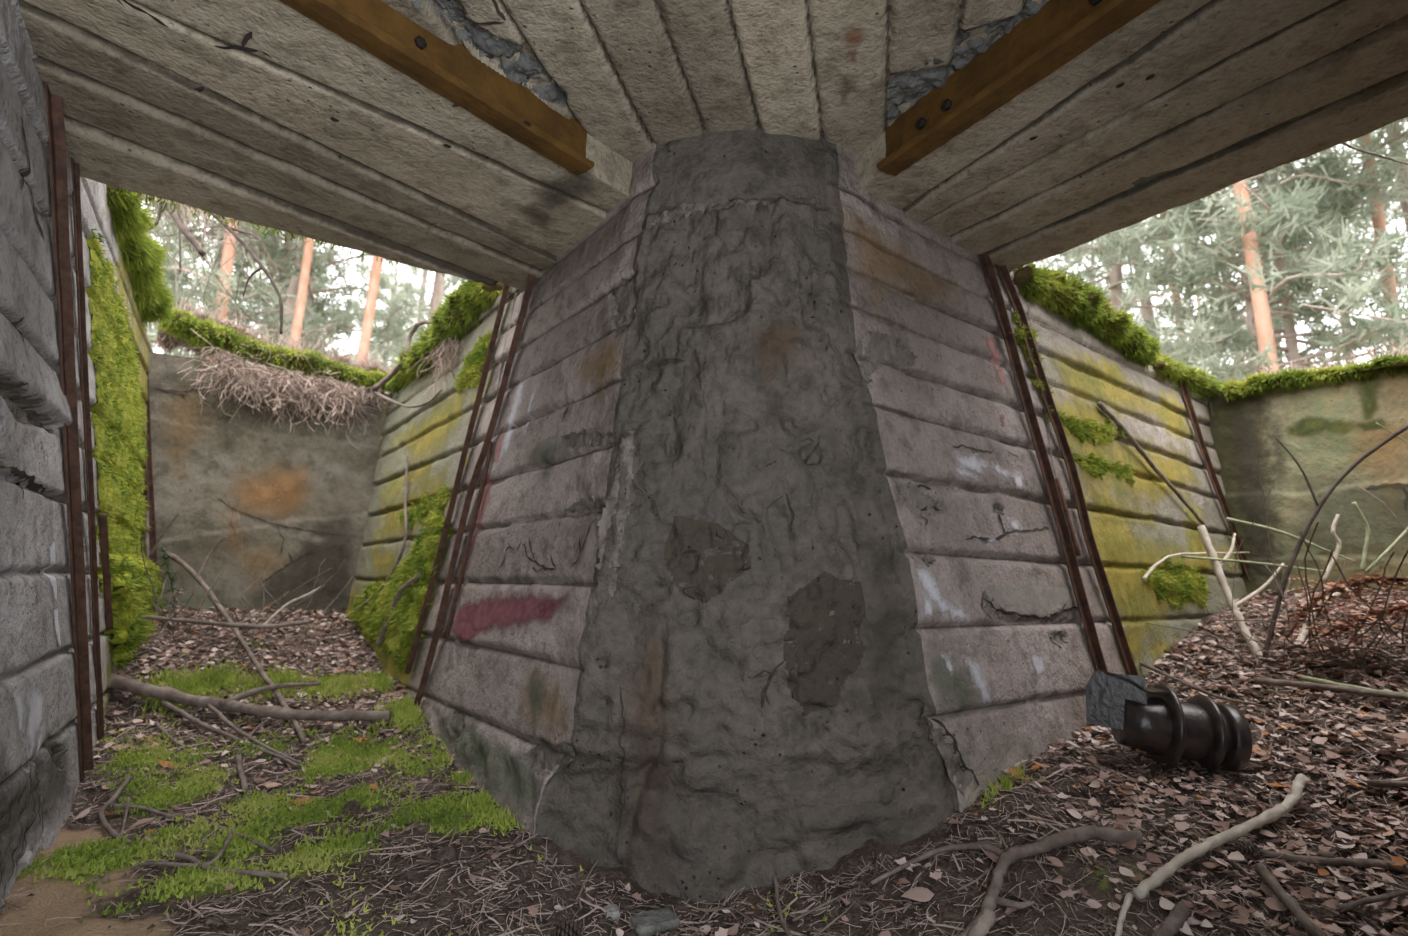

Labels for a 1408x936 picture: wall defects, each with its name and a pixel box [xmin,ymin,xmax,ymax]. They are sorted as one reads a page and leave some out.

spalling [886,0,1048,122]
crack [916,484,941,525]
crack [966,510,1049,544]
crack [983,598,1078,622]